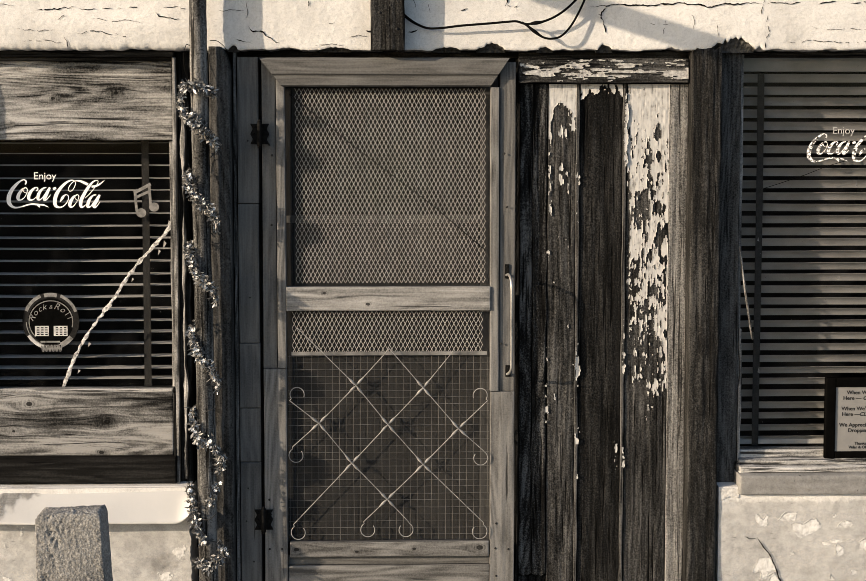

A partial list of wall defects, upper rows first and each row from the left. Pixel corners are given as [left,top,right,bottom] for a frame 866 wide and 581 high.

crack [593,1,865,48]
peeling [520,44,688,419]
peeling [756,511,822,539]
crack [747,537,781,581]
peeling [752,557,780,581]
peeling [822,538,866,557]